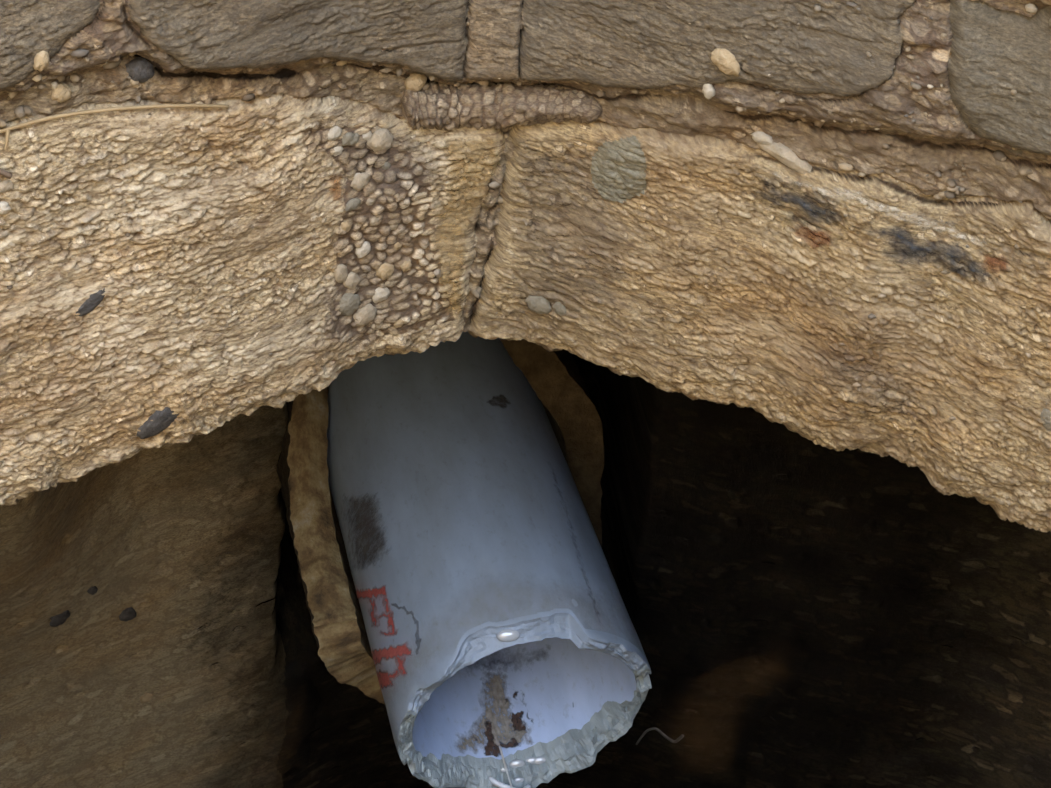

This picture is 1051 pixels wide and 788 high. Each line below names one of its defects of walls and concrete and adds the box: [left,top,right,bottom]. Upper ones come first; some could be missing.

damp [221,488,434,788]
damp [536,353,989,788]